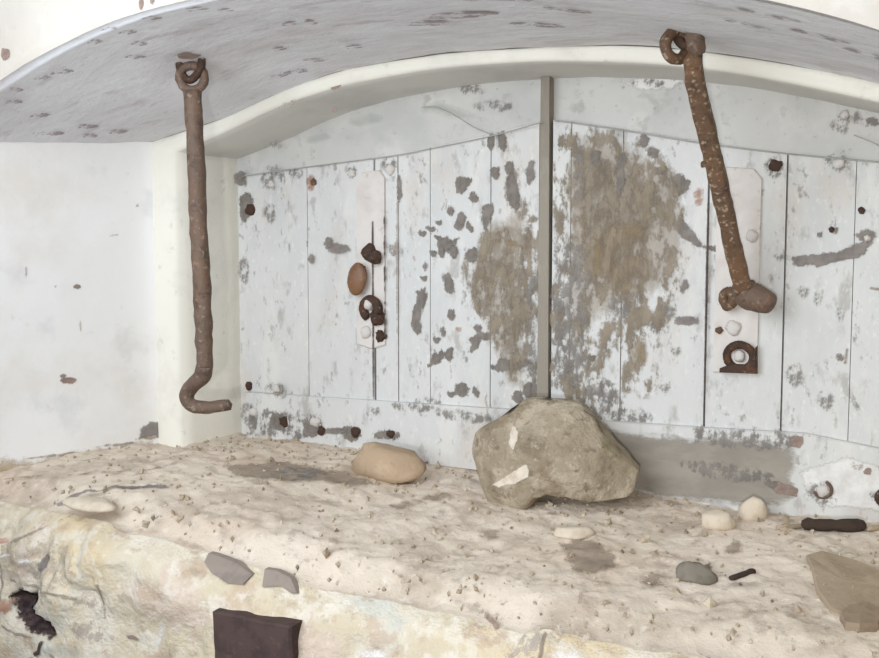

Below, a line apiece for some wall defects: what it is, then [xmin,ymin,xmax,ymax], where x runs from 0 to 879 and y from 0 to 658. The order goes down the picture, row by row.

peeling [487,131,507,151]
corrosion [856,229,876,243]
peeling [411,160,539,403]
damp [549,128,684,406]
peeling [240,403,361,442]
peeling [374,429,400,440]
peeling [392,382,491,424]
spalling [0,528,104,658]